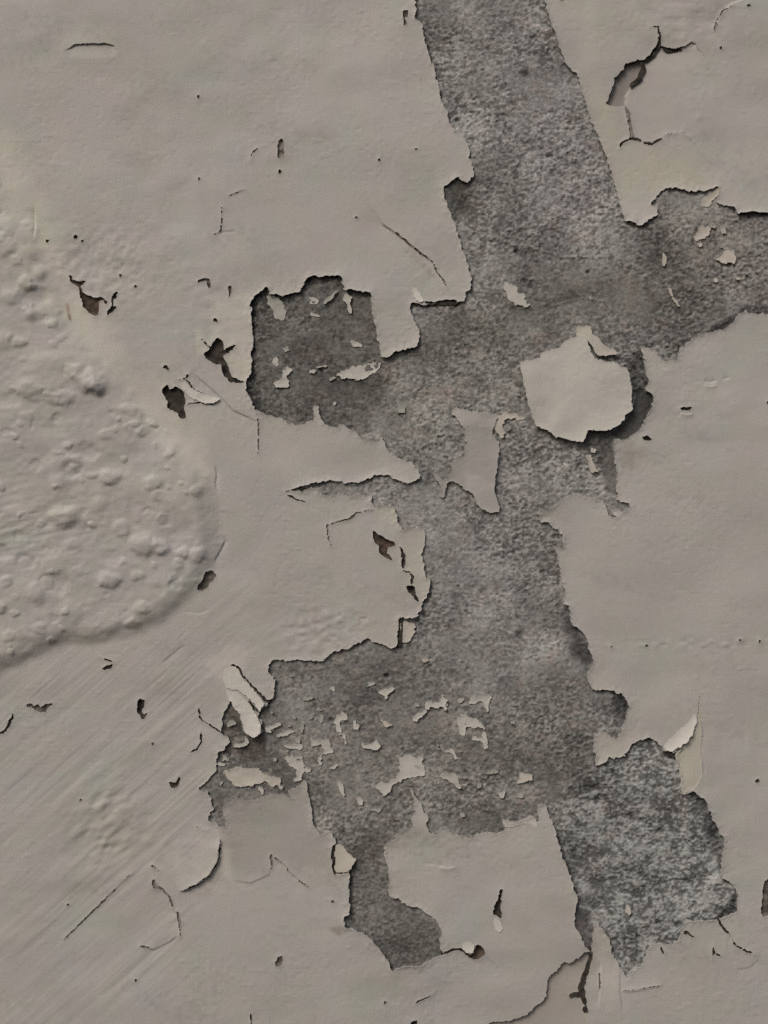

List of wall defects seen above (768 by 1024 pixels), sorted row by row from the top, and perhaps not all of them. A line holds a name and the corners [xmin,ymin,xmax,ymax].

crack [619,26,695,147]
spalling [69,276,118,316]
crack [395,233,459,306]
spalling [162,382,220,419]
peeling [172,0,768,975]
crack [64,889,116,940]
crack [151,840,221,936]
crack [569,946,655,1006]